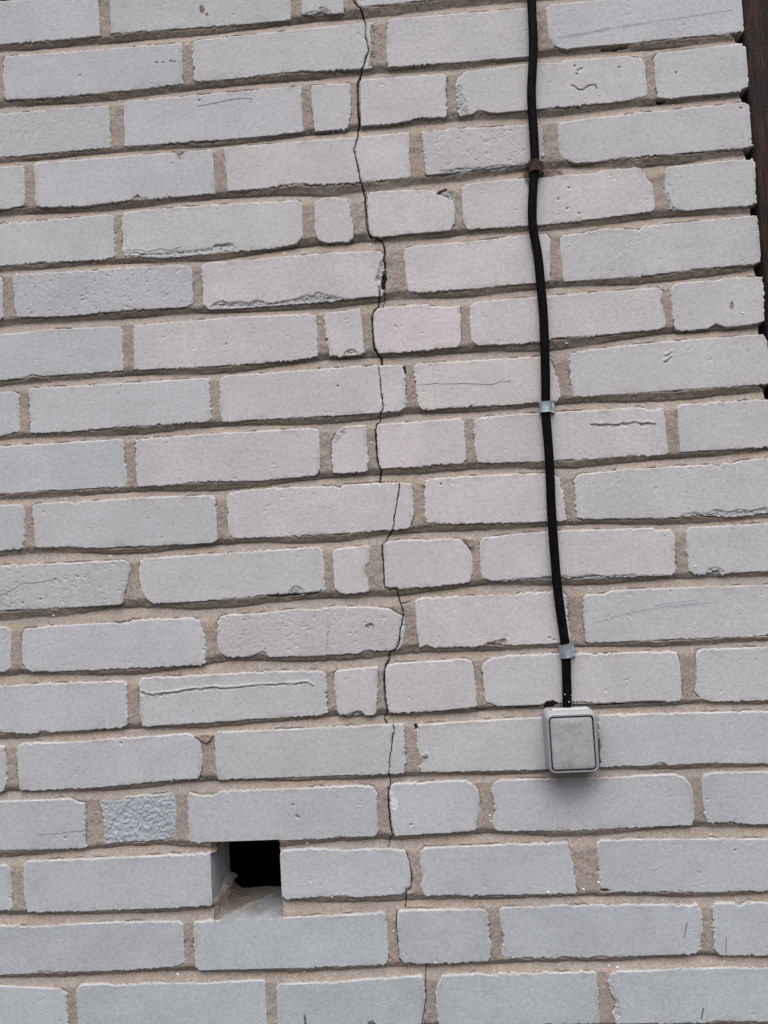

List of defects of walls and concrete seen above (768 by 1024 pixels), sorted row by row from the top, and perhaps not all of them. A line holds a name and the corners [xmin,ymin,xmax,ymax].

spalling [125,243,237,257]
spalling [210,292,347,308]
crack [353,0,427,1024]